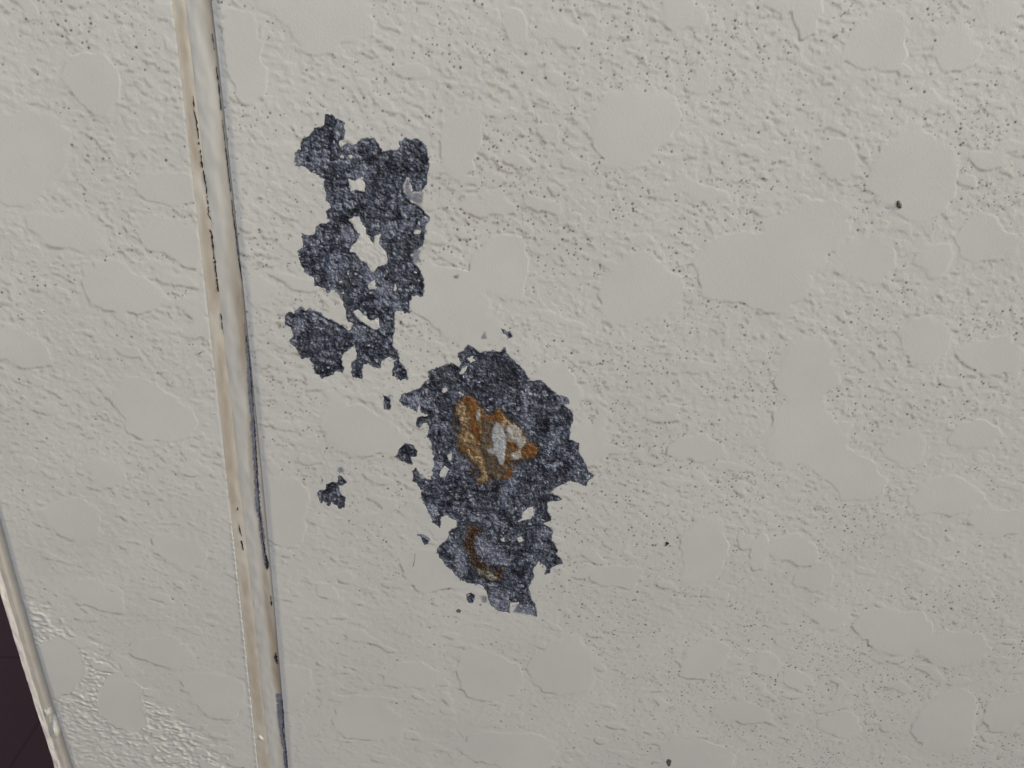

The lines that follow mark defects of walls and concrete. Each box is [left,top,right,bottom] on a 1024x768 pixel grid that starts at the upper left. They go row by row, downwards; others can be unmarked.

peeling [285,114,594,617]
rust [460,397,503,455]
rust [502,441,537,480]
rust [466,527,502,581]